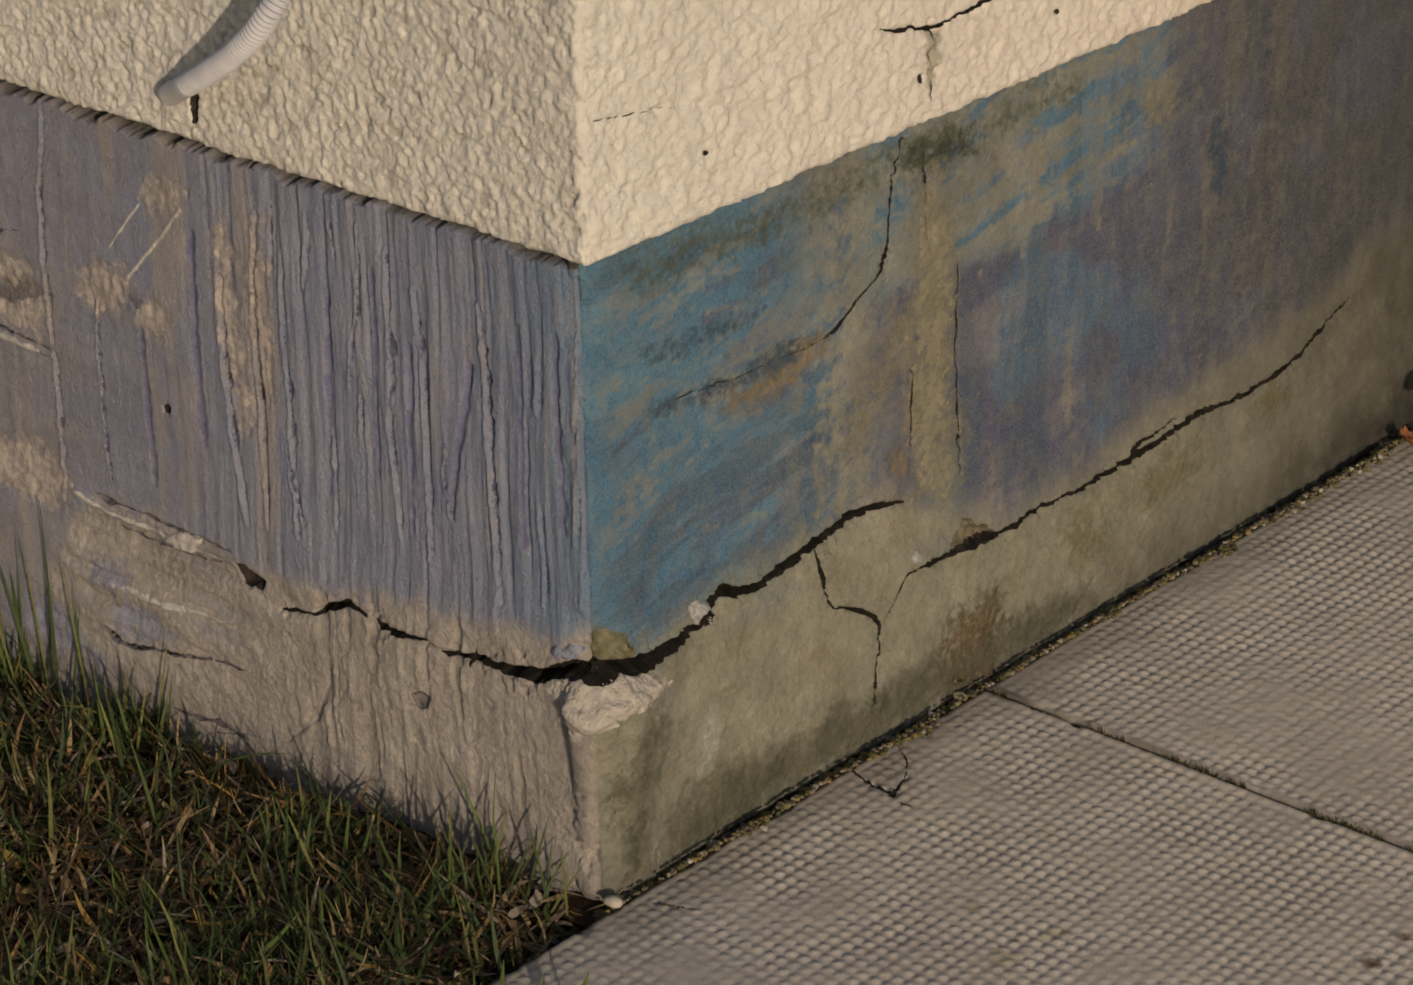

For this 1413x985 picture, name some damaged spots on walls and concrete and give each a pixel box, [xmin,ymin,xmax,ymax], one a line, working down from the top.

crack [879,0,992,101]
crack [656,137,928,410]
crack [953,264,961,472]
flaking render [166,530,203,554]
spalling [236,563,266,590]
crack [282,297,1349,704]
spalling [411,690,430,709]
peeling [551,644,587,660]
spalling [543,667,673,736]
water stain [941,588,1005,696]